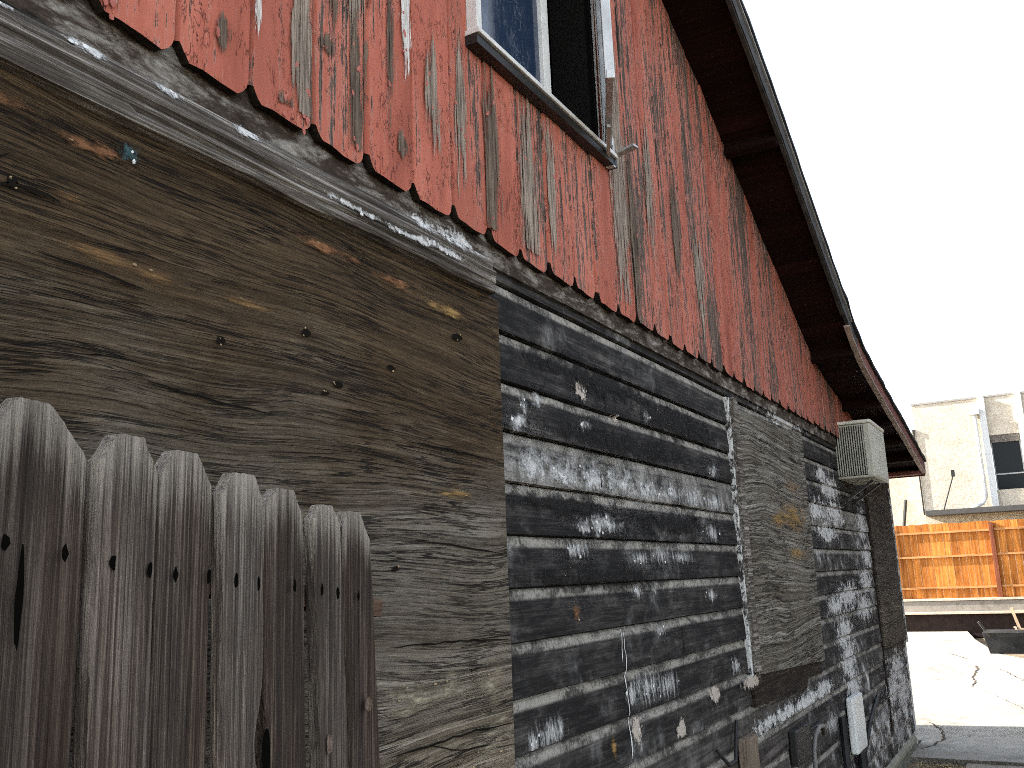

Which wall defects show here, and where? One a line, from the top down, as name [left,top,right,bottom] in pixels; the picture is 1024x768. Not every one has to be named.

peeling [68,37,105,60]
peeling [279,0,368,151]
peeling [387,0,411,151]
peeling [236,125,259,140]
peeling [516,101,558,256]
peeling [328,193,375,219]
peeling [388,213,484,260]
water stain [519,342,716,467]
water stain [510,488,709,535]
water stain [538,565,657,594]
crack [950,653,1023,709]
crack [923,722,946,748]